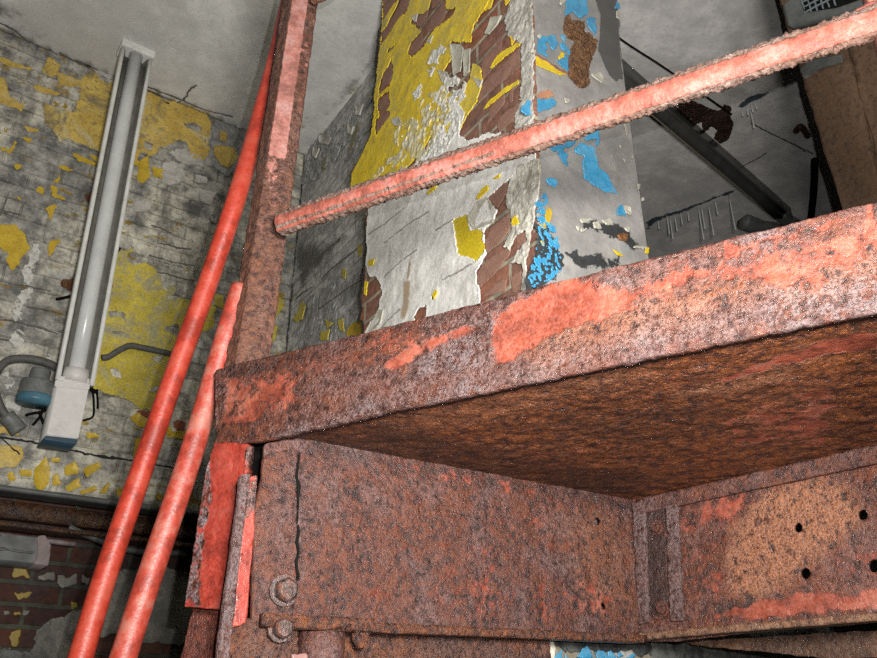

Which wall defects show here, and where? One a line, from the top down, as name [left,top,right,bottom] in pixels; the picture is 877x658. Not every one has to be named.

peeling [0,56,114,219]
peeling [134,91,246,205]
peeling [300,0,570,186]
peeling [550,130,634,232]
rust [401,263,411,317]
peeling [292,153,562,349]
peeling [93,248,191,456]
crack [0,437,40,455]
crack [70,449,133,461]
peeling [0,602,82,658]
peeling [94,567,139,658]
peeling [139,567,193,656]